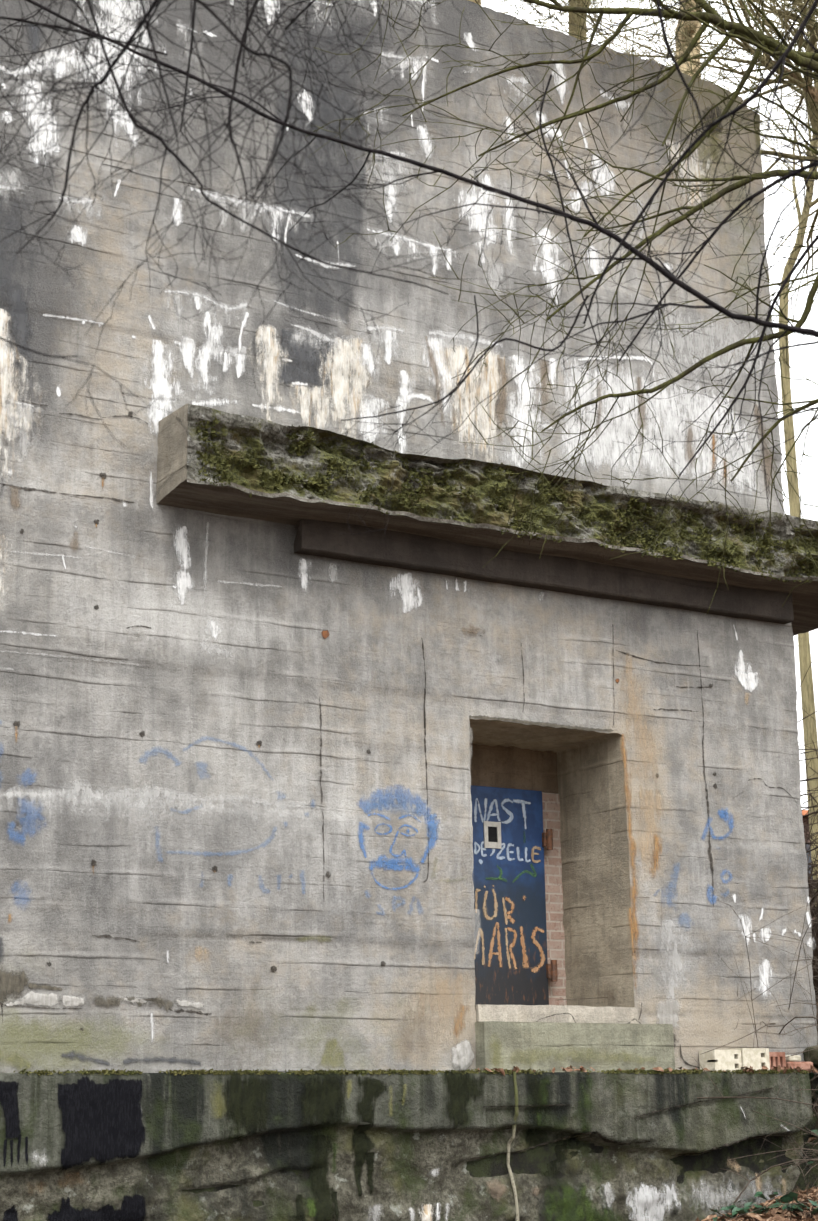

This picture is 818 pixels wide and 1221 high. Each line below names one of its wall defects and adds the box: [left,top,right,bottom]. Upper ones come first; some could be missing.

damp [0,0,156,163]
damp [0,206,34,475]
damp [70,225,87,246]
damp [148,0,772,490]
crack [318,698,326,899]
crack [421,638,430,882]
rust [621,666,661,973]
crack [612,625,714,907]
damp [0,1081,21,1139]
damp [3,1205,18,1221]
efflorescence [409,1203,448,1221]
damp [545,1184,677,1221]